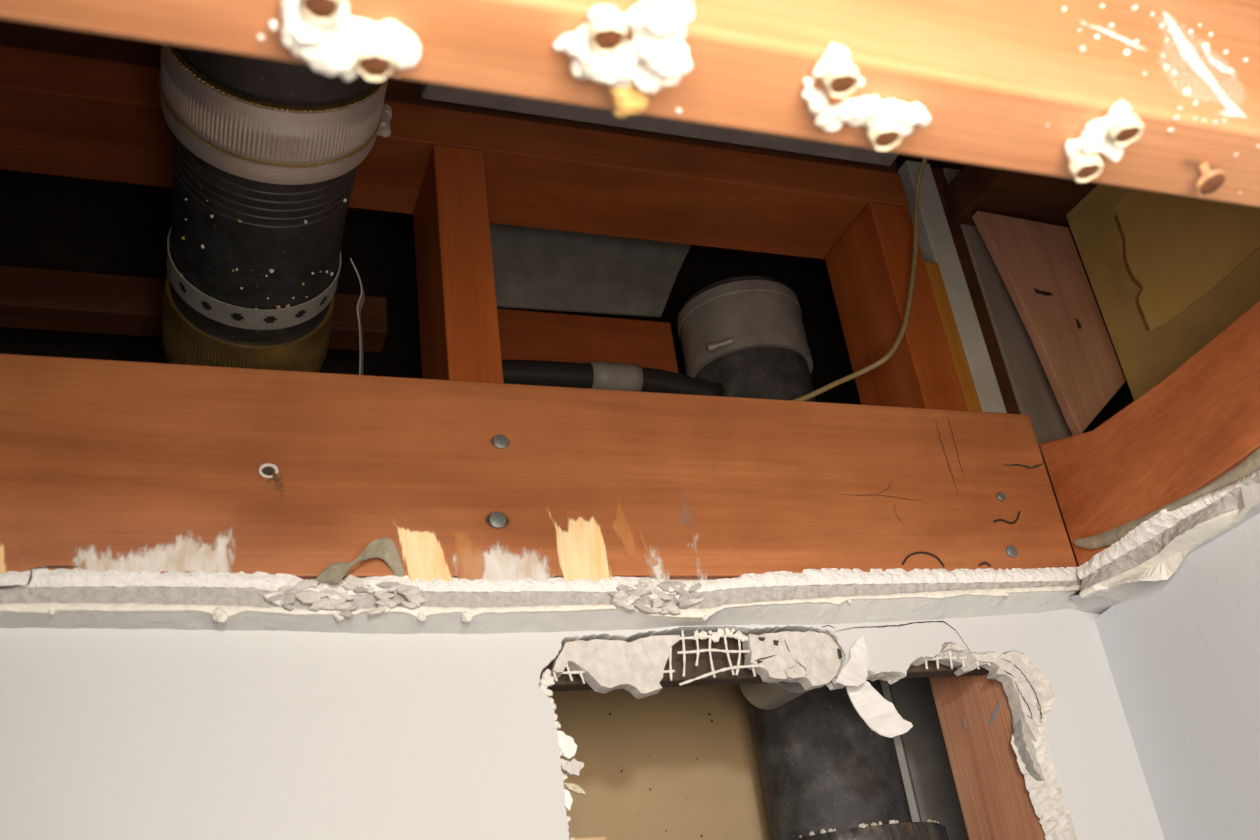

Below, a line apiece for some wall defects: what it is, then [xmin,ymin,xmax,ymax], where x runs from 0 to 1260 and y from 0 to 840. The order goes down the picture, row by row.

crack [935,416,965,494]
crack [1006,460,1045,469]
spalling [0,448,1260,822]